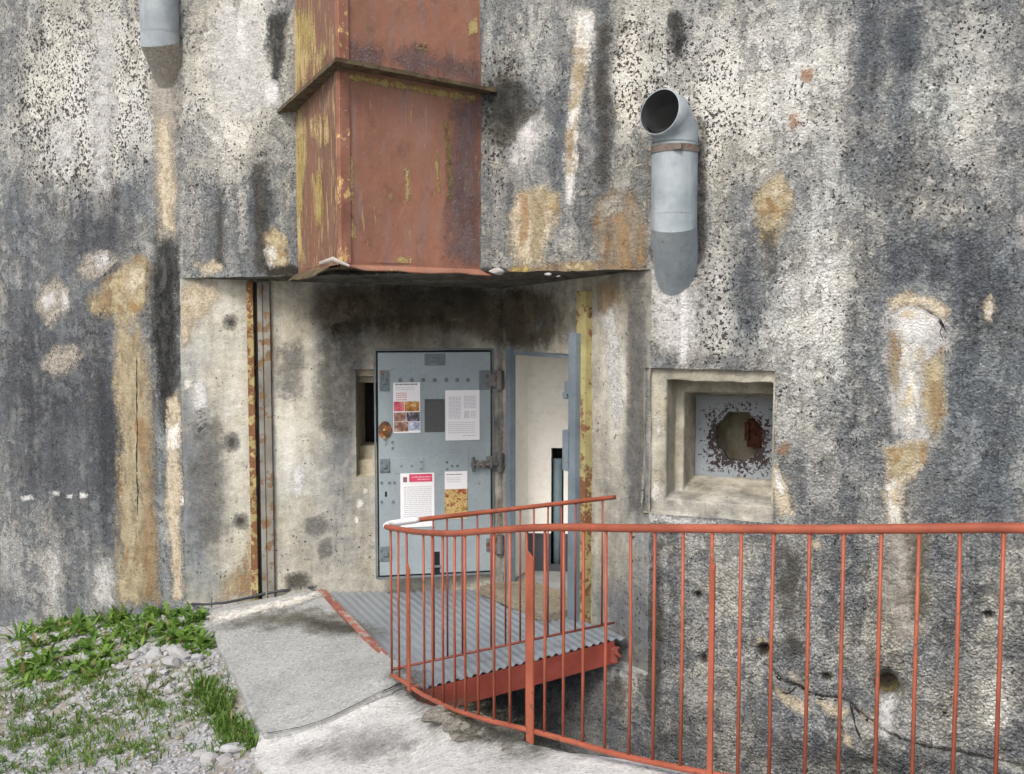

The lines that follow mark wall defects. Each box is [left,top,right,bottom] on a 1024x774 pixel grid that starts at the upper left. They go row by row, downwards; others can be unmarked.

rust [447,101,482,266]
water stain [276,344,304,399]
water stain [316,335,359,437]
crack [133,359,141,514]
water stain [49,550,60,601]
water stain [94,558,117,606]
crack [773,671,882,739]